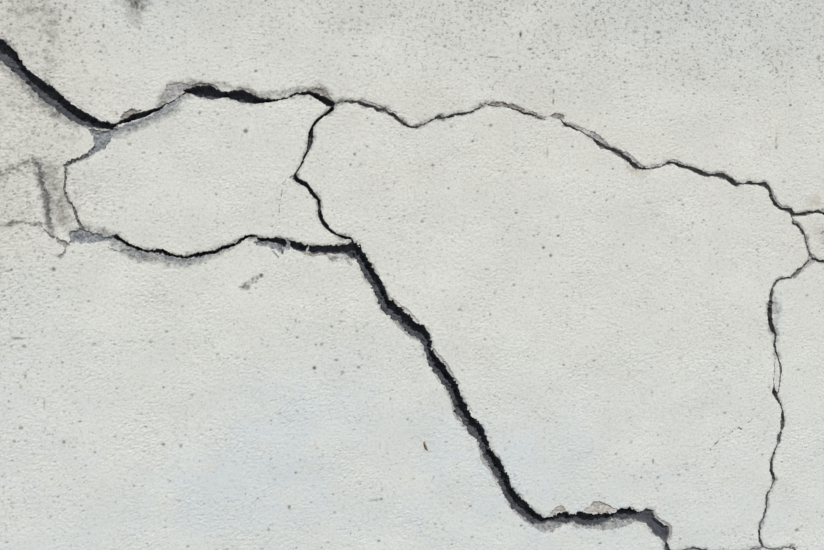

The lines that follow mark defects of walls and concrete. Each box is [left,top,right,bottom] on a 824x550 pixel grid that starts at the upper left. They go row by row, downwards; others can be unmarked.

crack [0,39,707,550]
crack [558,118,824,550]